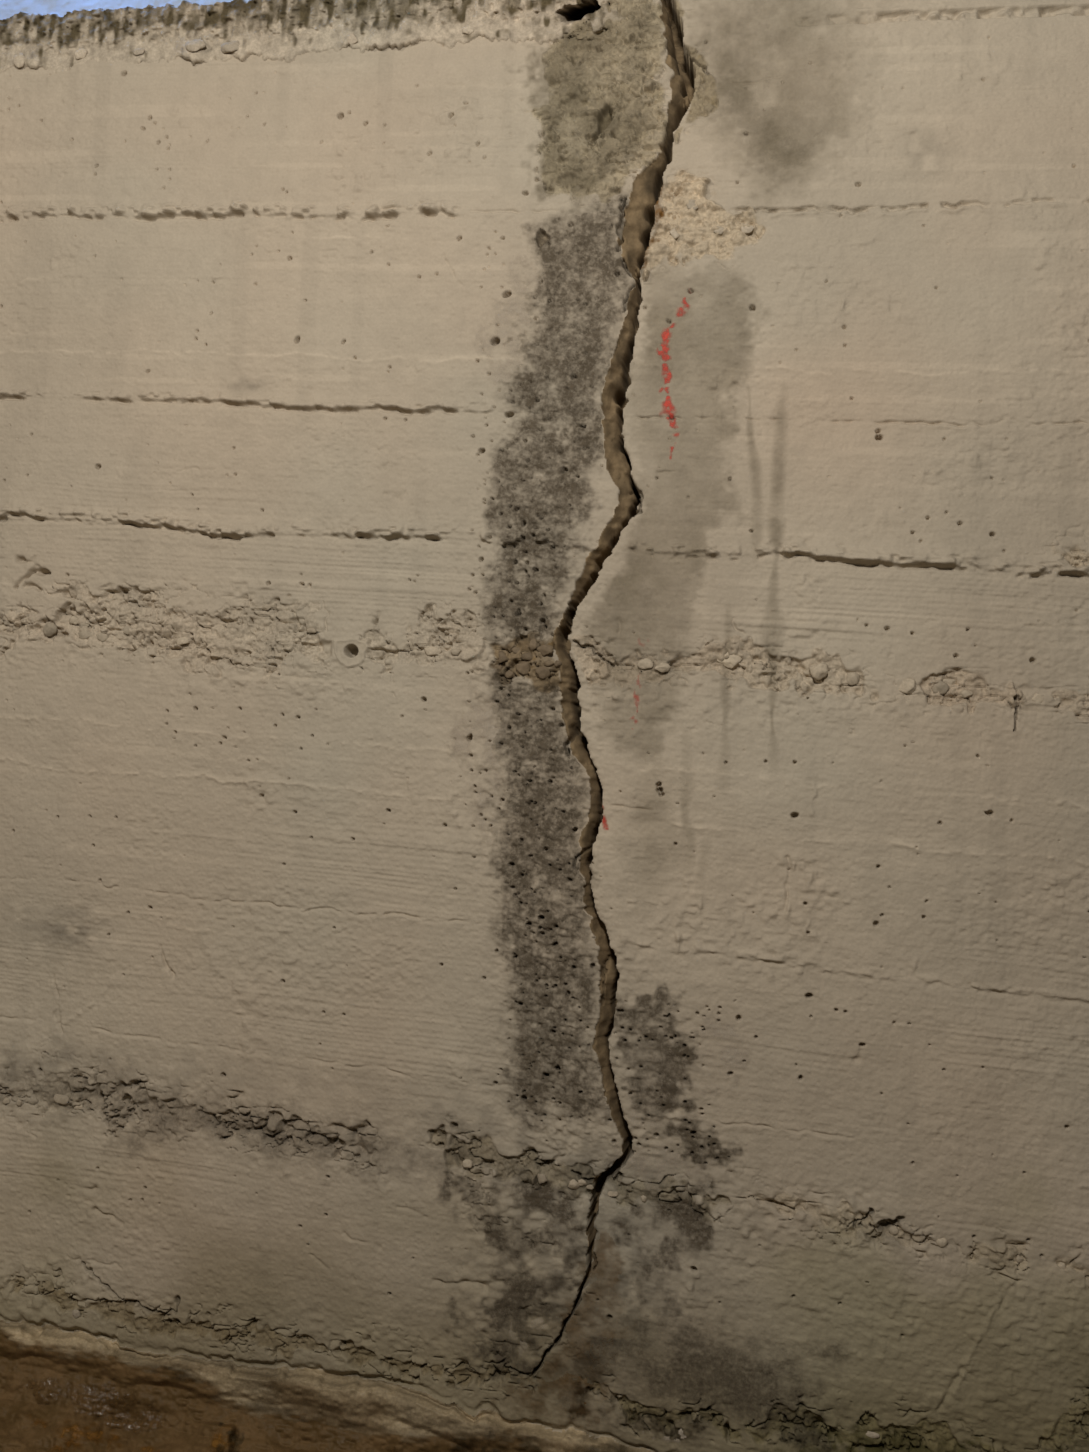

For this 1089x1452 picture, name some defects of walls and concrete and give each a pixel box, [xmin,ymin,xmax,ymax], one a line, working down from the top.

spalling [0,0,719,204]
damp [483,195,630,636]
spalling [643,170,766,282]
damp [453,673,602,1126]
crack [505,0,709,1378]
damp [614,987,746,1273]